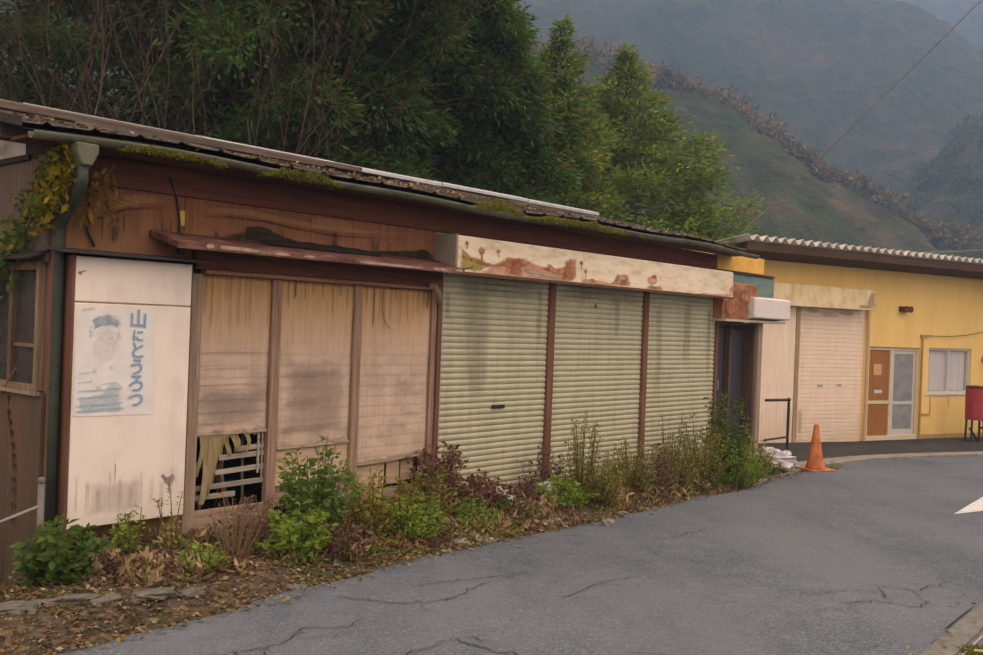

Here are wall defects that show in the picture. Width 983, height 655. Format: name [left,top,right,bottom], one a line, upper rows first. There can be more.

crack [220,573,519,655]